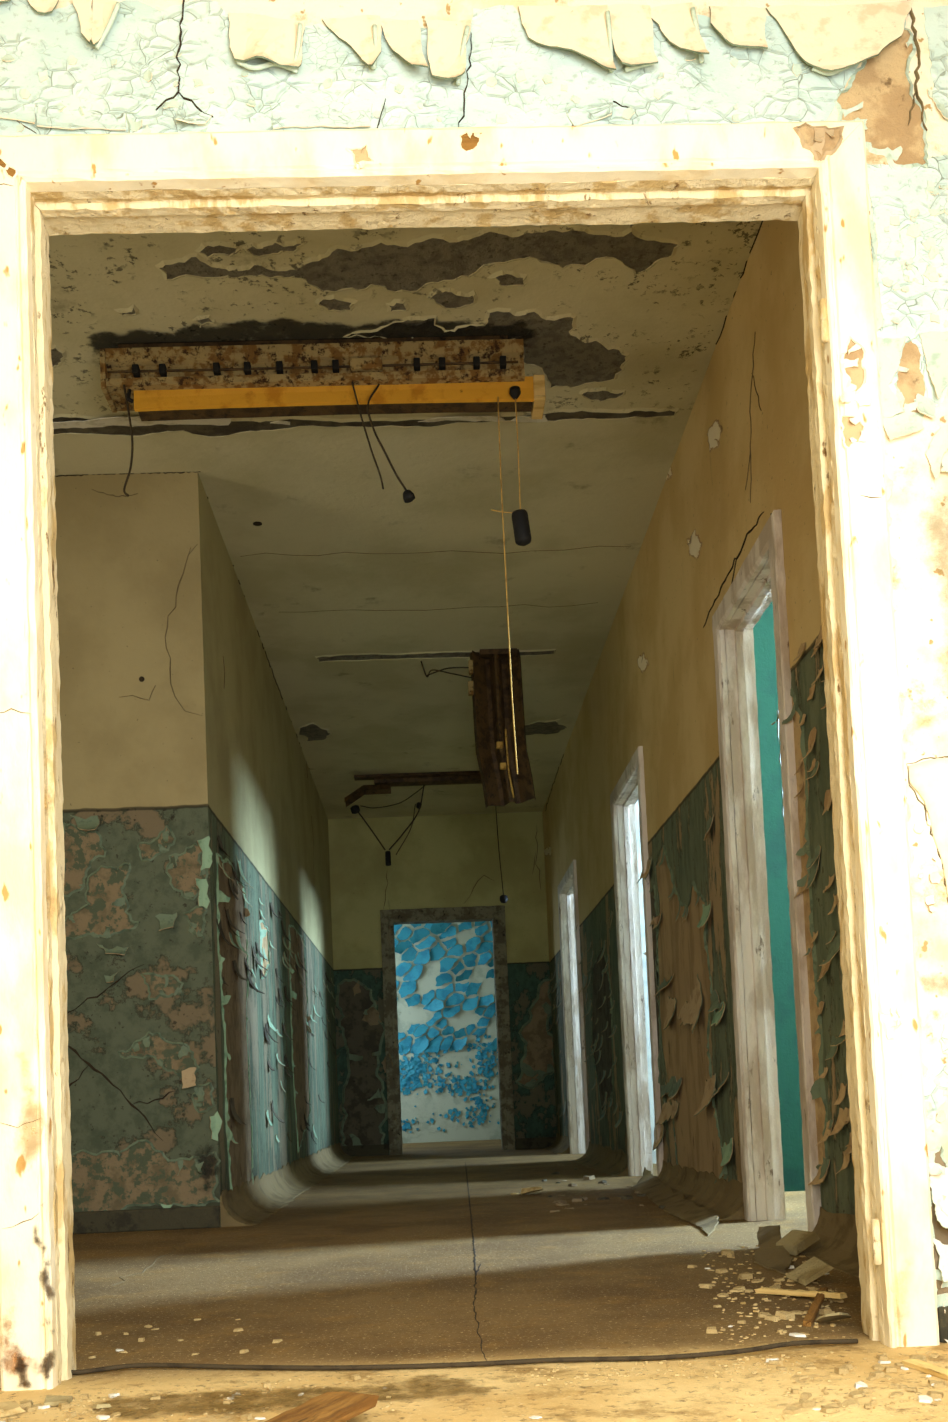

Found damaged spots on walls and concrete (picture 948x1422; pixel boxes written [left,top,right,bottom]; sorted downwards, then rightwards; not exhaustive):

crack [156,0,213,117]
crack [458,32,472,127]
peeling [0,0,948,479]
crack [55,471,209,499]
crack [703,221,772,628]
crack [122,545,202,716]
peeling [63,815,139,955]
peeling [71,835,336,1212]
peeling [381,921,499,1133]
peeling [637,845,733,1184]
crack [465,1165,487,1361]
peeling [928,1141,948,1312]